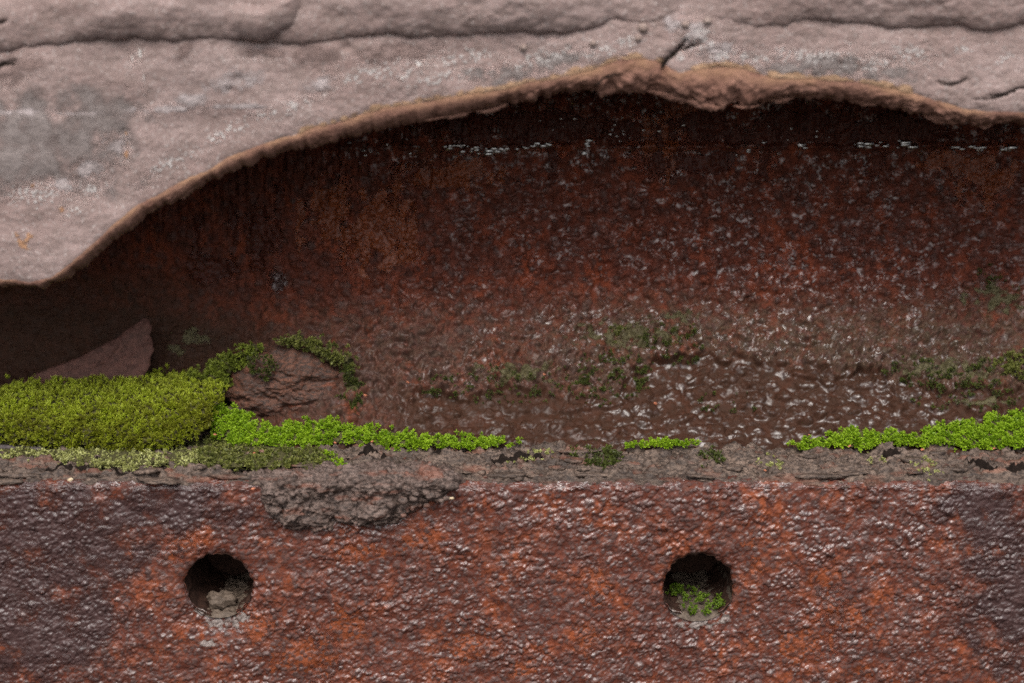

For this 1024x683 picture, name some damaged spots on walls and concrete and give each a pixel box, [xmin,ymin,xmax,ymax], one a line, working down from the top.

crack [650,41,700,77]
corrosion [691,60,913,93]
corrosion [636,101,697,188]
corrosion [295,155,507,286]
corrosion [23,317,154,386]
corrosion [244,603,368,678]
corrosion [444,629,491,666]
corrosion [777,561,885,670]